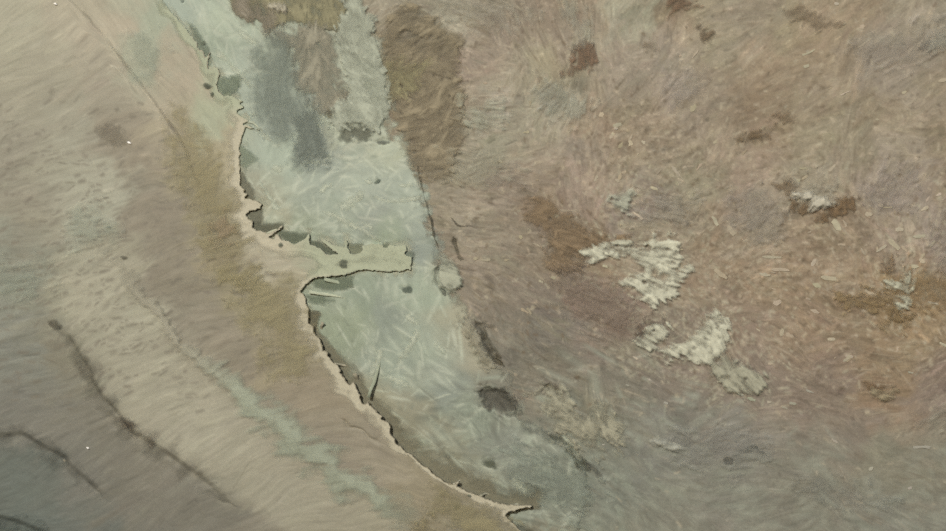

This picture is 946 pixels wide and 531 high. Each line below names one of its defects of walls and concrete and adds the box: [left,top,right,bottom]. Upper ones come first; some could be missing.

flaking render [0,0,590,531]